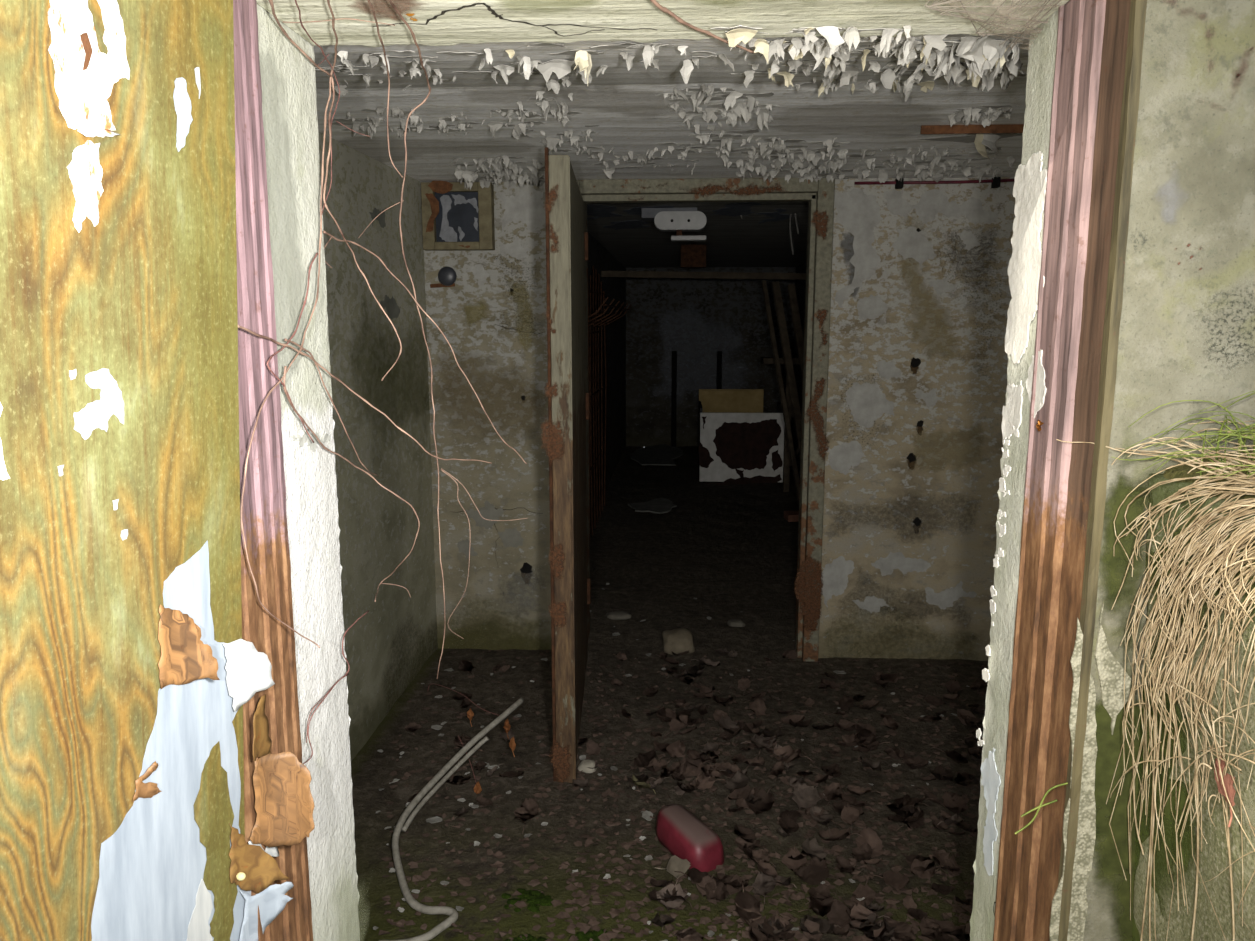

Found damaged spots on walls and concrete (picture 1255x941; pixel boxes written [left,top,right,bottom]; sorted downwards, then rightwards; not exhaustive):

crack [373,3,656,37]
peeling [48,0,130,233]
rust [545,185,559,253]
peeling [315,25,1047,568]
rust [817,309,828,345]
damp [841,234,858,296]
peeling [69,368,124,440]
rust [806,377,829,461]
rust [794,555,823,631]
peeling [982,645,991,682]
peeling [91,540,315,941]